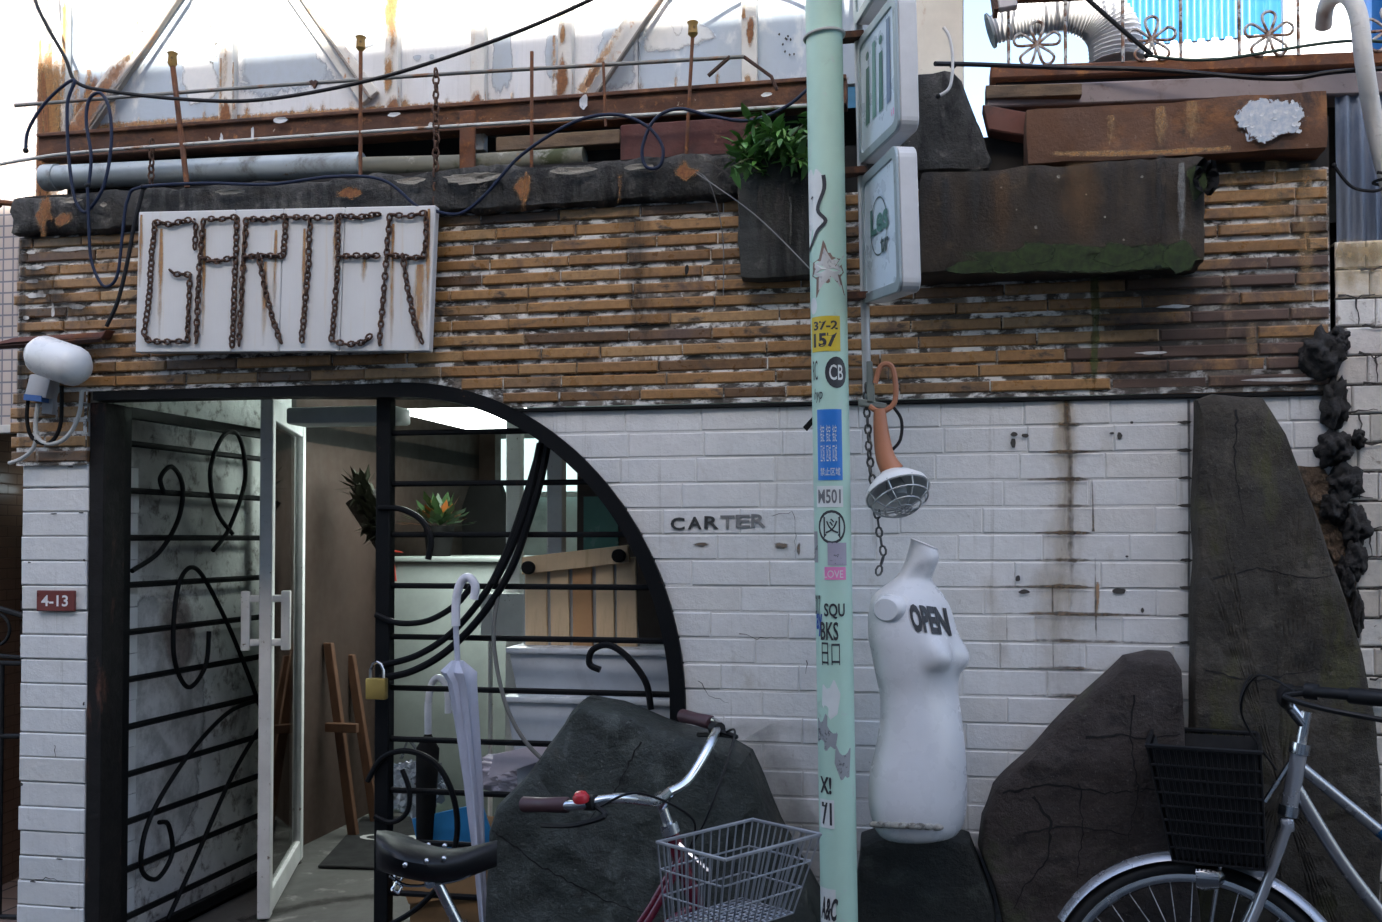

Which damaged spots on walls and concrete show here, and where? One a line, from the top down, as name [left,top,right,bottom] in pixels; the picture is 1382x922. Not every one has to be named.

corrosion [552,25,620,95]
corrosion [35,0,484,232]
corrosion [1060,106,1234,164]
corrosion [514,174,530,205]
corrosion [676,162,699,180]